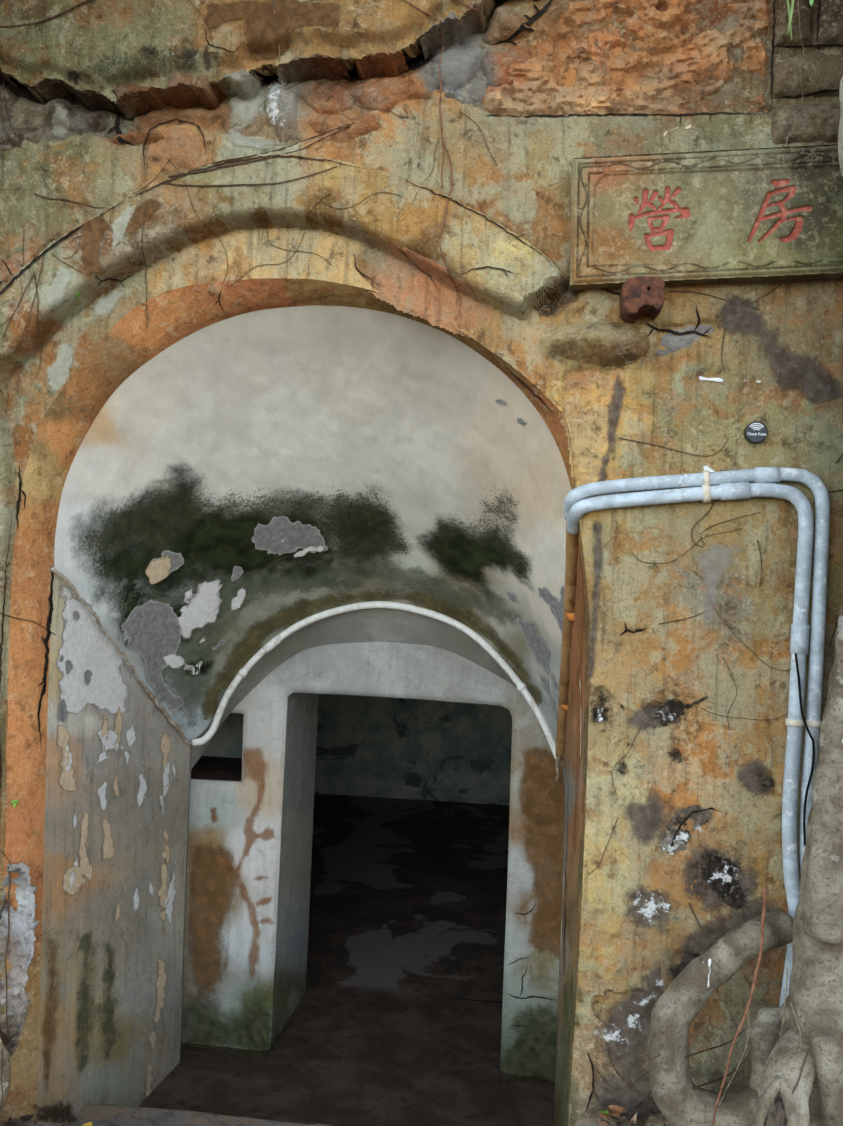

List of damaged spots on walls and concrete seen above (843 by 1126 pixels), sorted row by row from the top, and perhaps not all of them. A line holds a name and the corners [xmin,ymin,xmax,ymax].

crack [204,0,552,96]
spalling [0,0,843,151]
crack [486,0,843,125]
crack [0,70,364,295]
peeling [124,550,184,590]
peeling [252,516,328,557]
water stain [79,467,542,726]
spalling [0,862,39,1057]
peeling [56,566,246,936]
rust [189,749,273,993]
rust [520,558,583,958]
spalling [659,805,712,854]